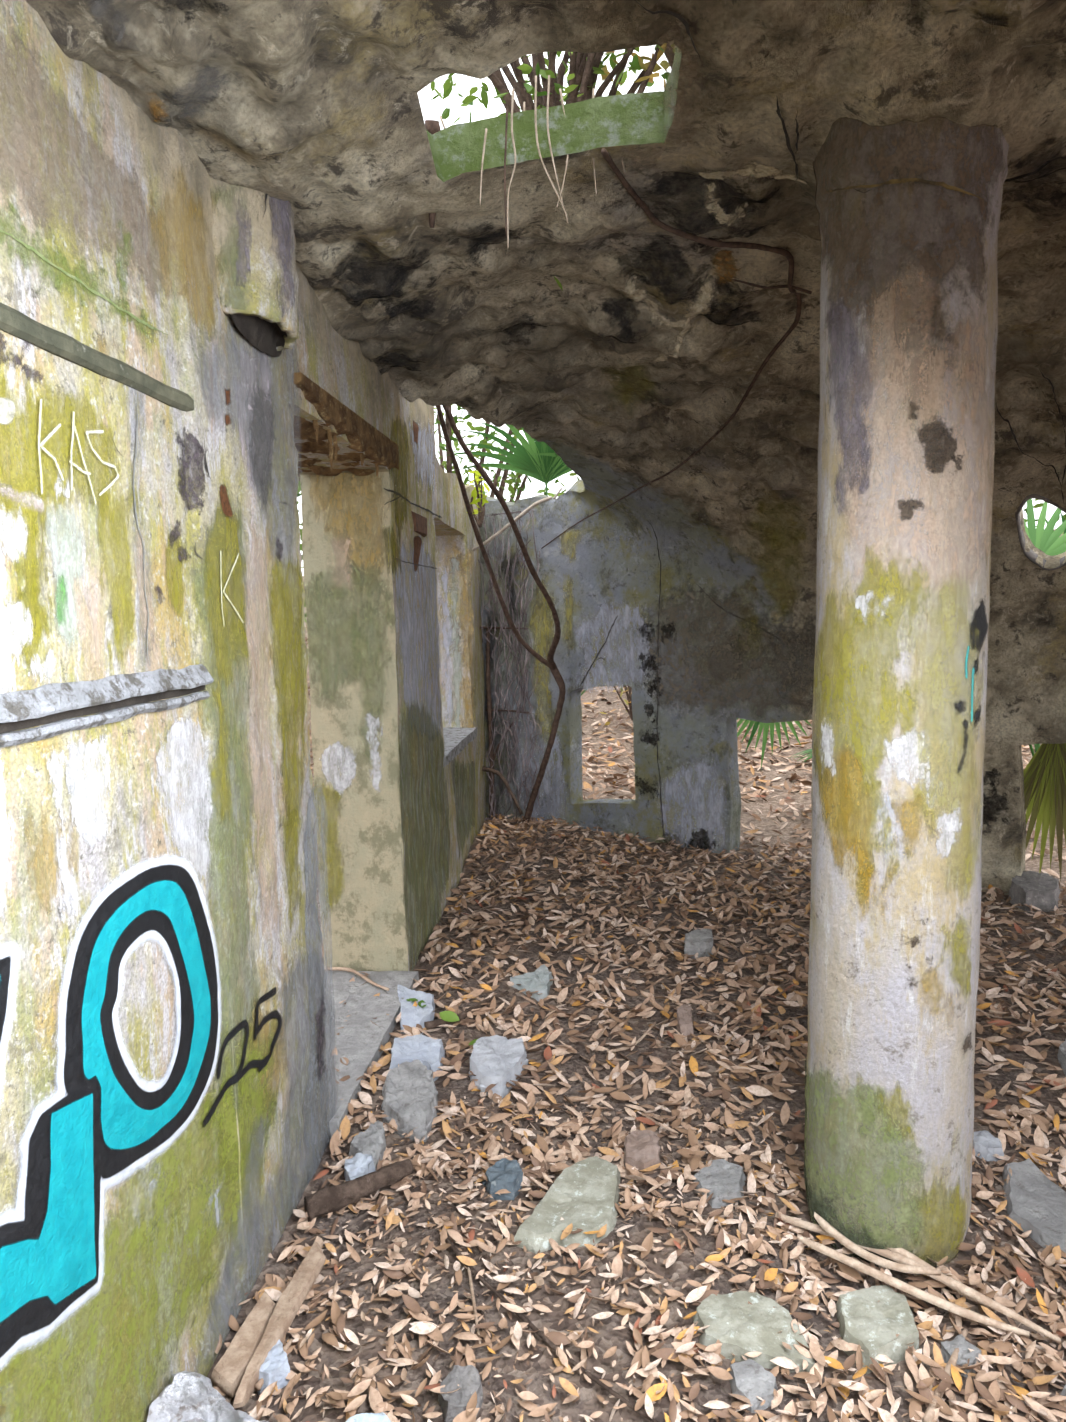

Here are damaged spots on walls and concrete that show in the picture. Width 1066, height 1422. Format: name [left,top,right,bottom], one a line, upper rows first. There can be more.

leakage [659,35,703,150]
crack [0,205,168,336]
leakage [333,242,436,320]
leakage [448,225,520,262]
leakage [497,313,546,345]
leakage [603,117,1066,892]
leakage [202,337,503,928]
leakage [501,553,573,738]
leakage [875,1087,913,1140]
leakage [914,1184,966,1264]